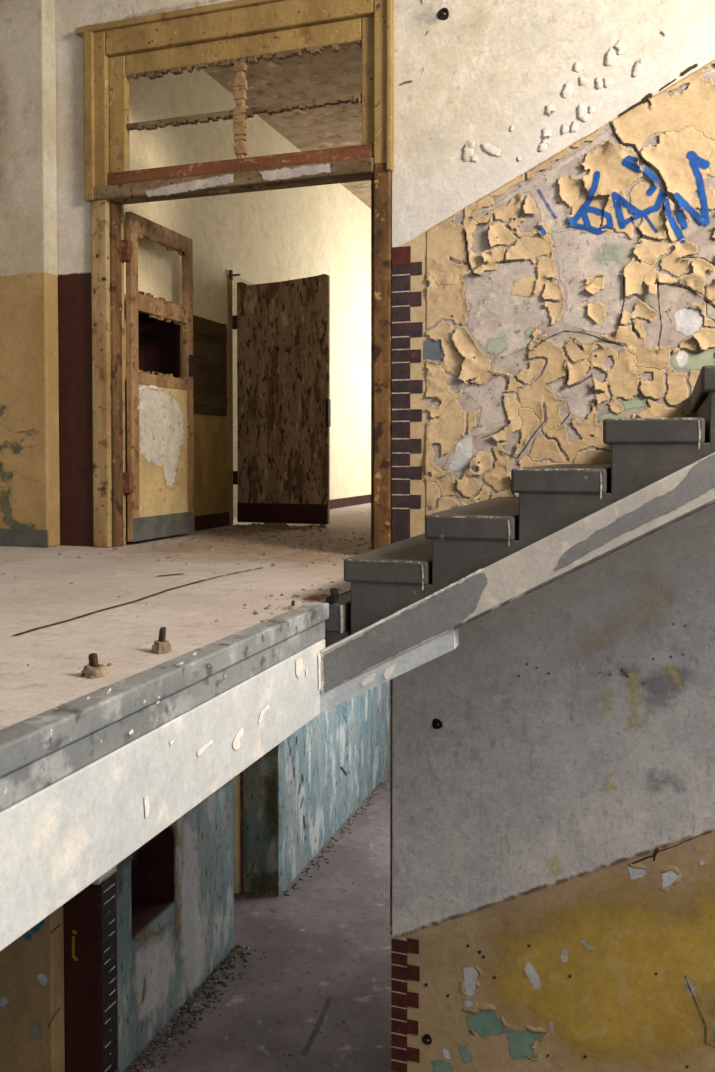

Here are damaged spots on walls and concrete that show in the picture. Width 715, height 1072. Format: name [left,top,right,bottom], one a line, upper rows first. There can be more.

peeling [138,385,185,490]
leakage [263,775,280,839]
leakage [251,872,279,894]
peeling [627,862,646,880]
peeling [659,865,682,893]
peeling [133,819,206,1020]
peeling [432,889,715,1072]